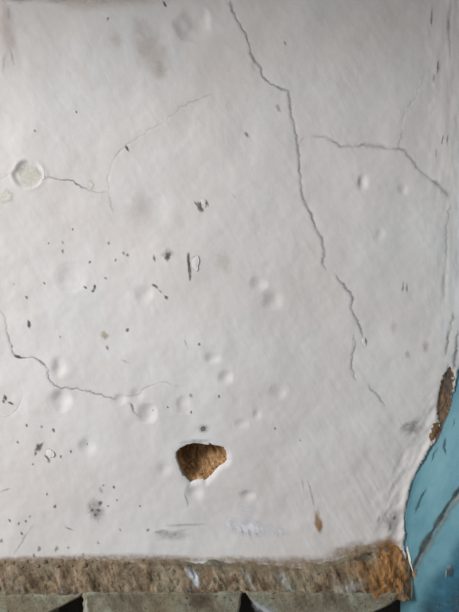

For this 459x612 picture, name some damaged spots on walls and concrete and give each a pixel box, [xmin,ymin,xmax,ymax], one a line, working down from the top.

spalling [429,367,455,446]
spalling [175,442,228,483]
spalling [371,540,413,601]